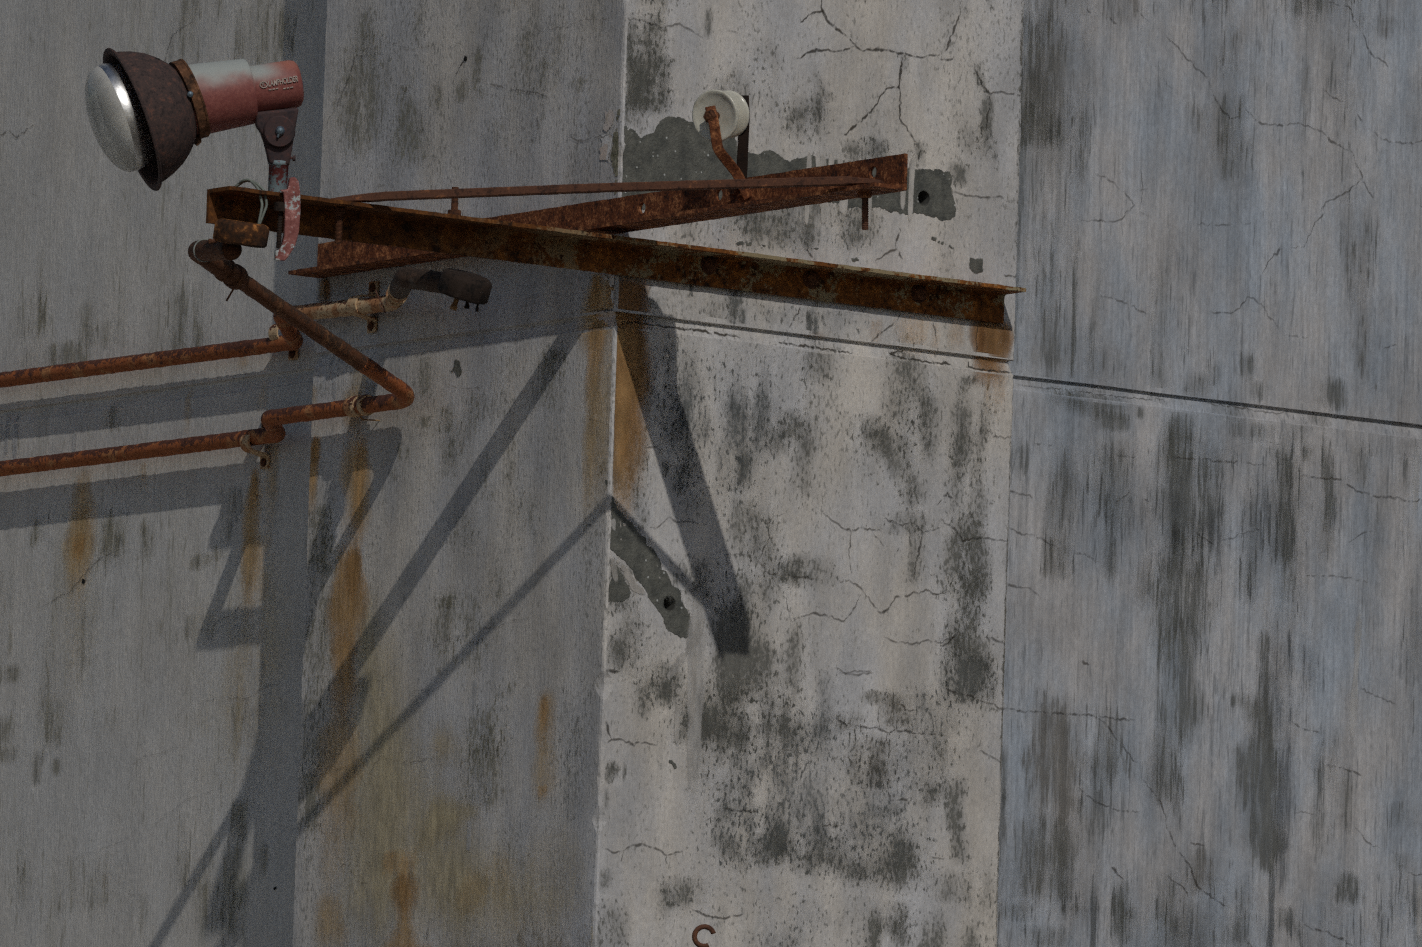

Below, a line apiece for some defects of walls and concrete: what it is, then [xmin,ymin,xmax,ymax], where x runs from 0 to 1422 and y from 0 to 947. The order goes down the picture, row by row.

crack [800,0,1021,159]
damp [1020,107,1053,144]
rust [972,321,1011,376]
damp [891,352,936,449]
damp [953,407,987,524]
rust [332,549,363,696]
damp [947,557,994,702]
damp [1160,531,1204,730]
damp [688,689,742,764]
damp [877,833,920,889]
damp [1025,824,1070,892]
damp [892,912,944,947]